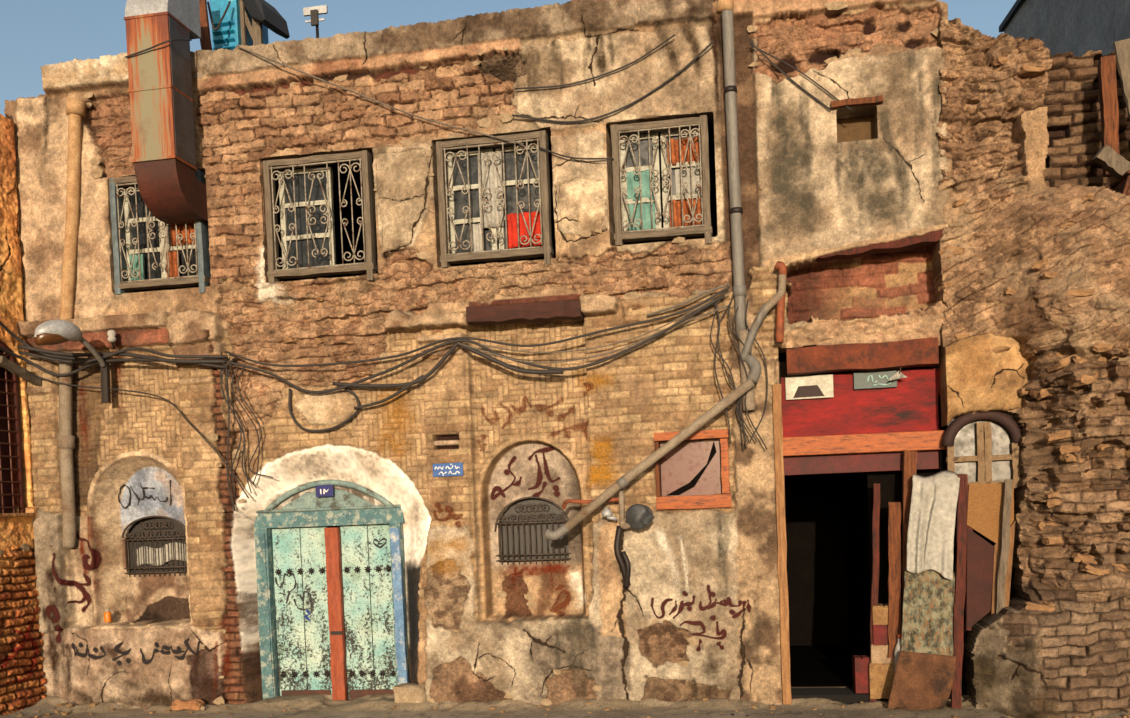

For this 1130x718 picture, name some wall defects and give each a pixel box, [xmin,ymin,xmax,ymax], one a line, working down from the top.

damp [909,57,941,124]
crack [381,146,435,258]
crack [552,158,607,242]
damp [770,84,820,228]
damp [837,112,904,218]
crack [883,137,925,201]
spalling [186,47,733,710]
crack [473,629,592,696]
crack [611,530,644,700]